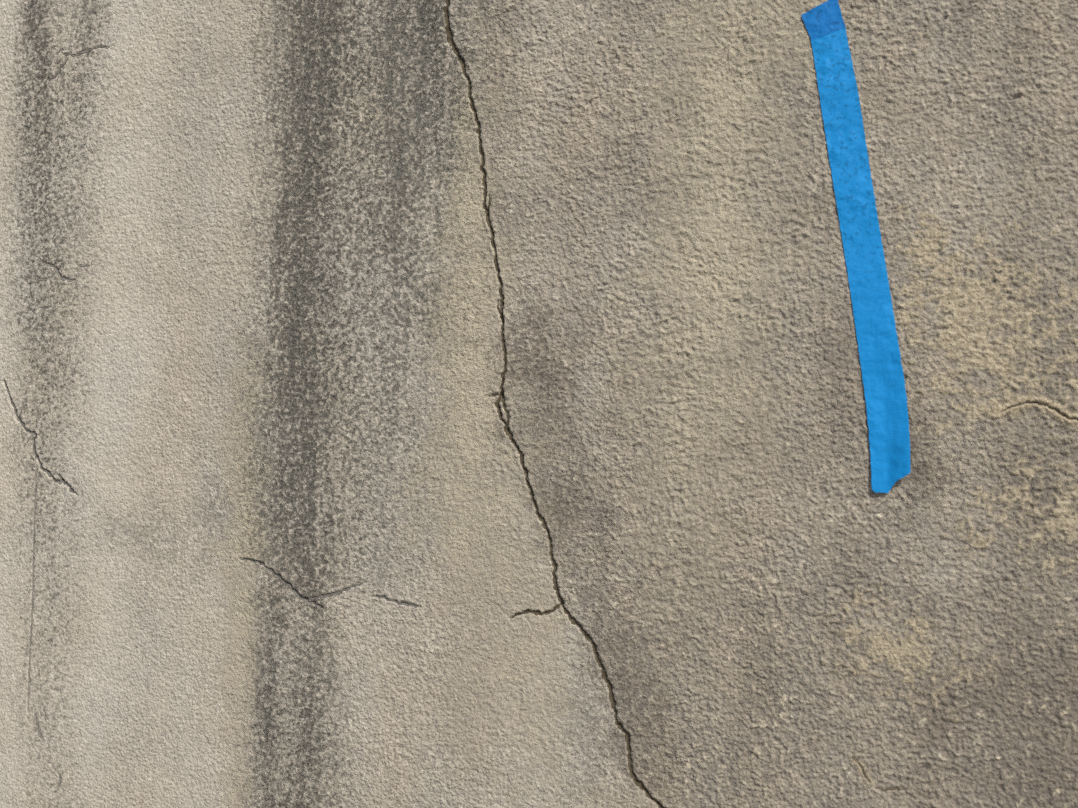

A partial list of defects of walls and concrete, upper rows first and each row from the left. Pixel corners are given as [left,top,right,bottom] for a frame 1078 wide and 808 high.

water stain [22,0,81,301]
crack [4,381,75,741]
crack [241,558,419,607]
water stain [220,0,569,808]
crack [444,0,664,808]
crack [993,395,1078,428]